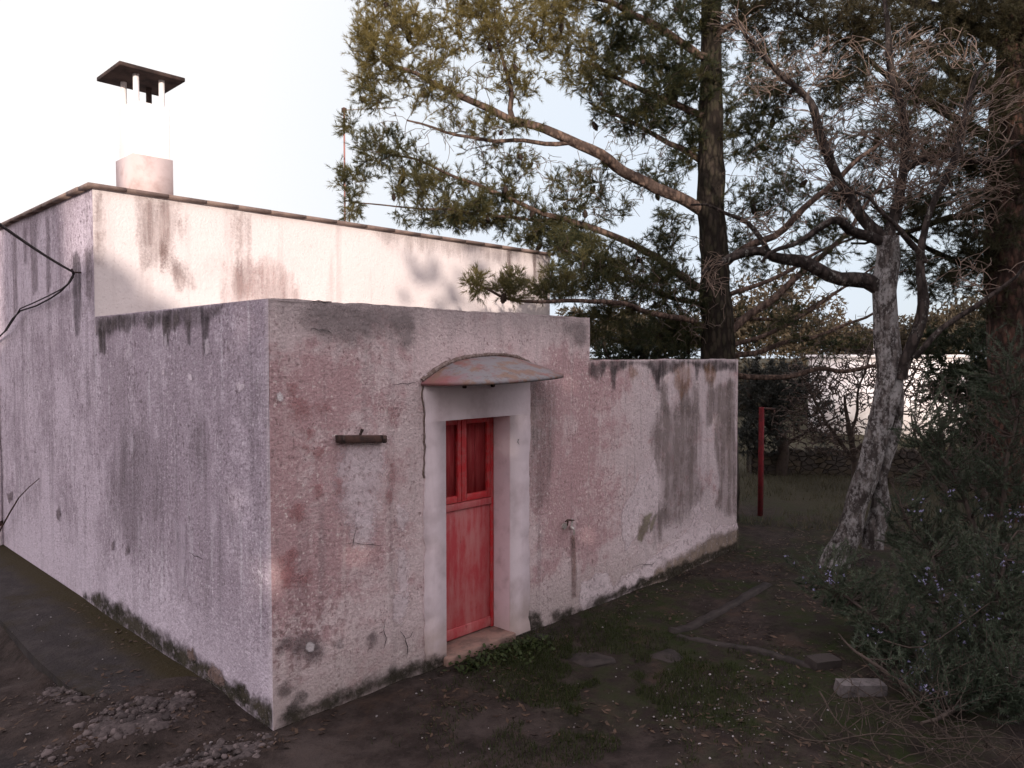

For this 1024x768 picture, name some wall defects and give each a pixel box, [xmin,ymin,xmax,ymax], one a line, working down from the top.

leakage [73,253,90,334]
leakage [96,308,217,354]
leakage [591,360,736,541]
leakage [83,593,444,729]